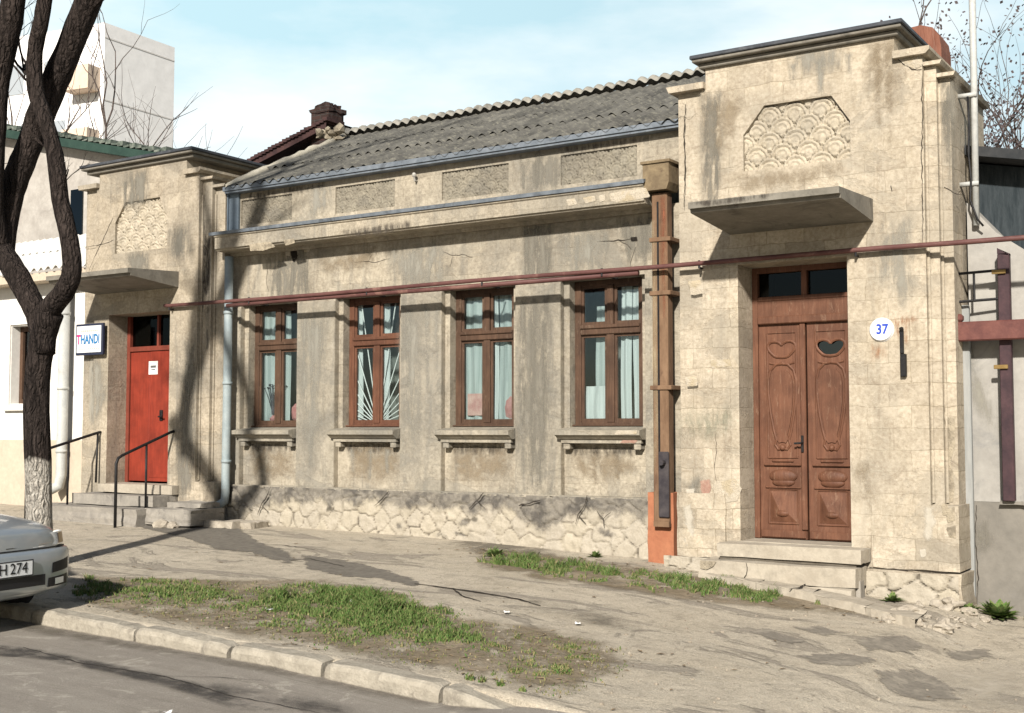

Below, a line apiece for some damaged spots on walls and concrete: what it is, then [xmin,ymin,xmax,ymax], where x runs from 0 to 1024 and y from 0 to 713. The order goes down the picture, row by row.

crack [680,104,688,193]
leakage [701,94,742,205]
crack [602,237,638,265]
crack [575,496,611,525]